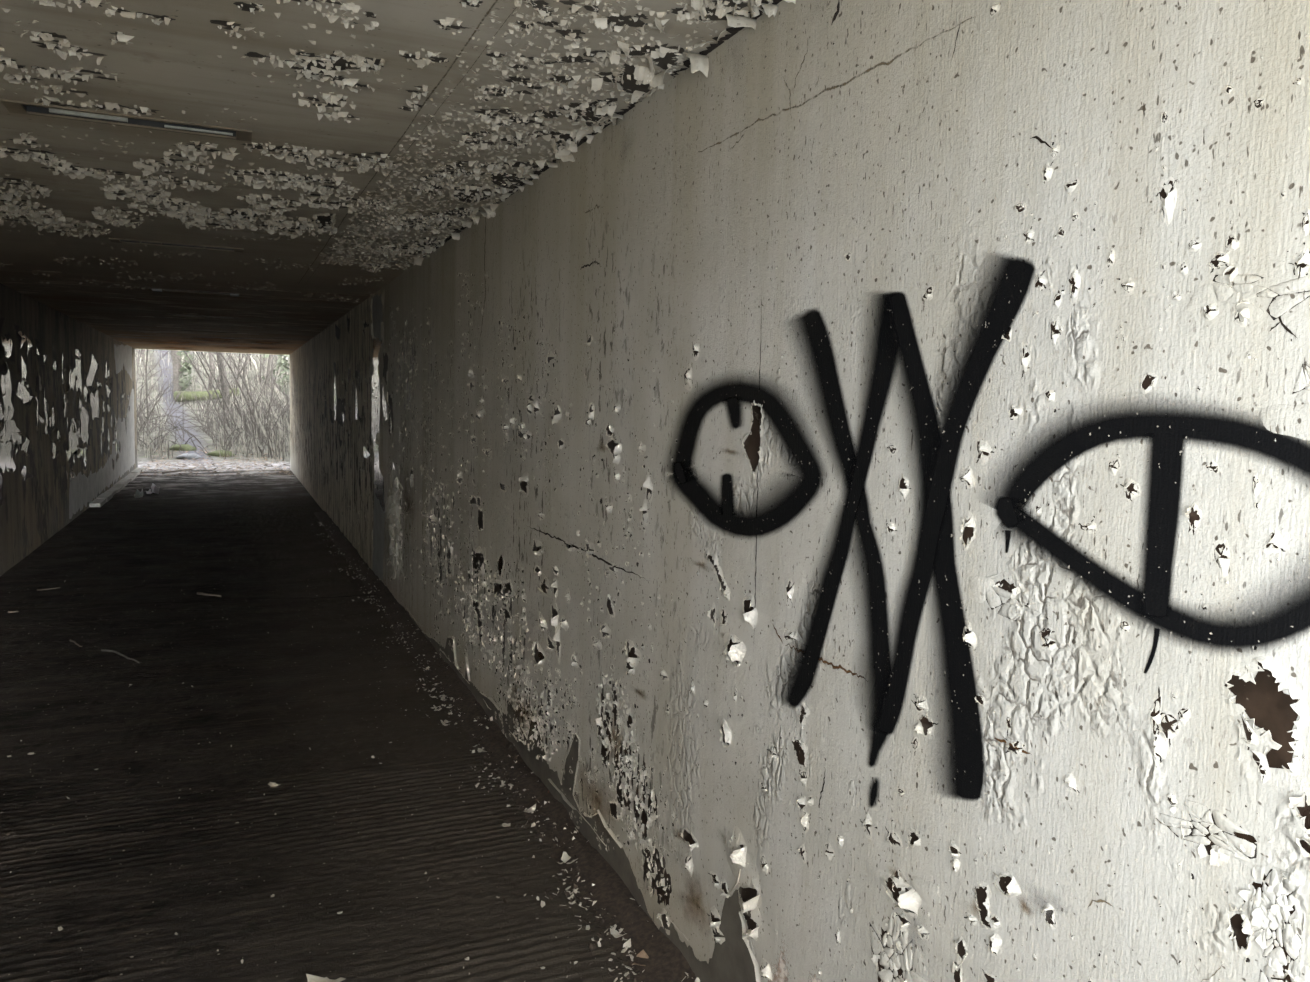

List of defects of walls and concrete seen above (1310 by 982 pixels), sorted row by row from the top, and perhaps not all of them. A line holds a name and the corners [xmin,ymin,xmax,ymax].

crack [669,0,782,79]
crack [831,0,840,25]
crack [421,99,640,347]
peeling [1123,372,1167,398]
peeling [0,0,796,982]
crack [533,528,647,581]
peeling [791,702,810,768]
peeling [1219,646,1310,785]
peeling [1155,800,1271,866]
peeling [879,844,909,913]
peeling [844,916,910,982]
peeling [1225,867,1305,982]